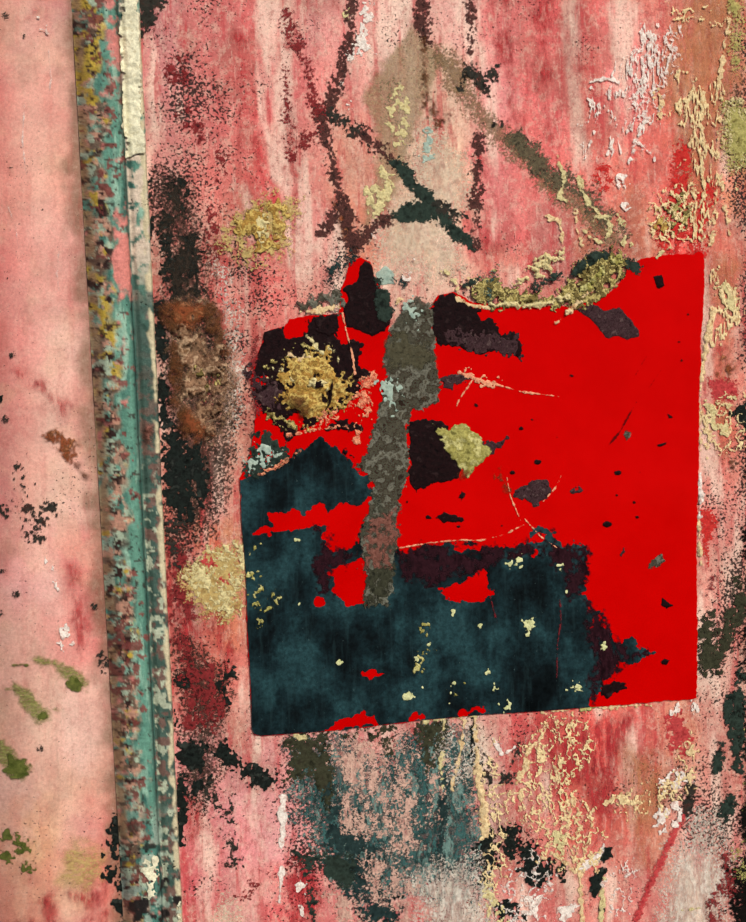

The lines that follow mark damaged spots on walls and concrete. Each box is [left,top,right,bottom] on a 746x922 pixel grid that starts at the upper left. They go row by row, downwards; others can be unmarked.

peeling [119,0,146,158]
peeling [431,155,644,362]
rust [159,301,232,356]
rust [168,342,204,437]
peeling [172,248,700,922]
peeling [100,813,123,922]
peeling [140,856,160,900]